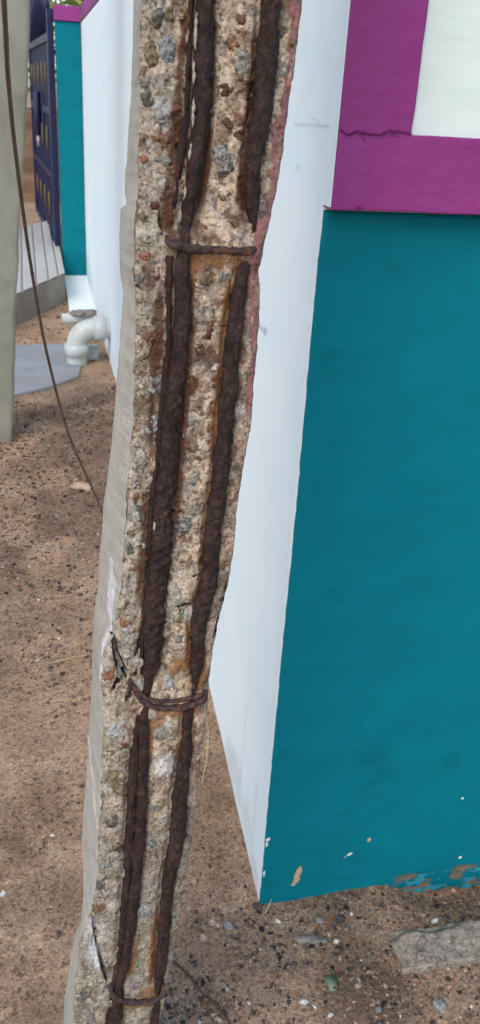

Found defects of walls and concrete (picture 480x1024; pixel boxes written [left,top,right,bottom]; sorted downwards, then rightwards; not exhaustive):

rust [160,11,188,241]
rust [199,23,215,205]
rust [236,31,258,217]
crack [293,117,413,143]
rust [146,293,164,441]
rust [173,253,239,542]
rust [137,499,149,599]
spalling [73,0,302,1024]
crack [109,631,140,701]
rust [170,624,210,688]
peeling [397,856,480,893]
rust [126,911,158,1009]